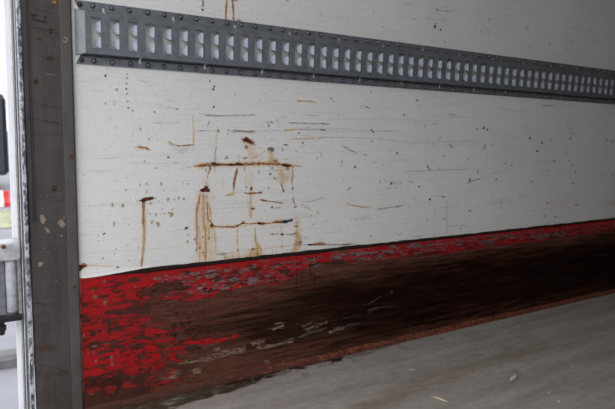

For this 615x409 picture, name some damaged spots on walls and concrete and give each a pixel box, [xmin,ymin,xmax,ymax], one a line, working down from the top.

peeling [80,228,615,408]